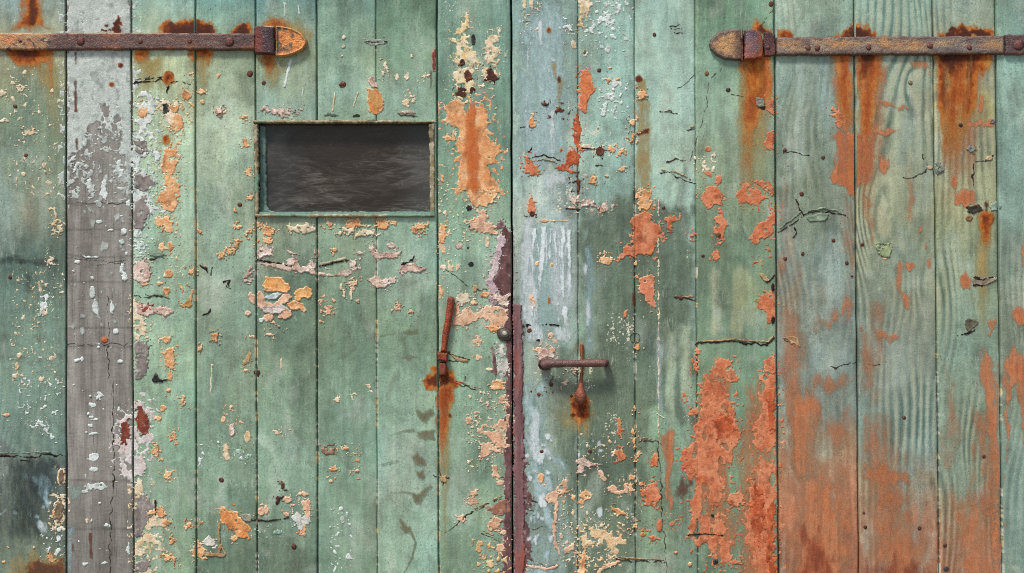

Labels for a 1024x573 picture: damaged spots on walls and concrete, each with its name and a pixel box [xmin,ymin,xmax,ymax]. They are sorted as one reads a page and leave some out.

rust [5,50,57,94]
peeling [58,0,141,33]
rust [738,52,773,181]
rust [830,55,886,164]
rust [934,54,992,171]
crack [779,199,848,238]
peeling [0,50,313,573]
peeling [216,0,921,573]
crack [67,295,127,573]
rust [423,365,460,513]
rust [566,394,592,435]